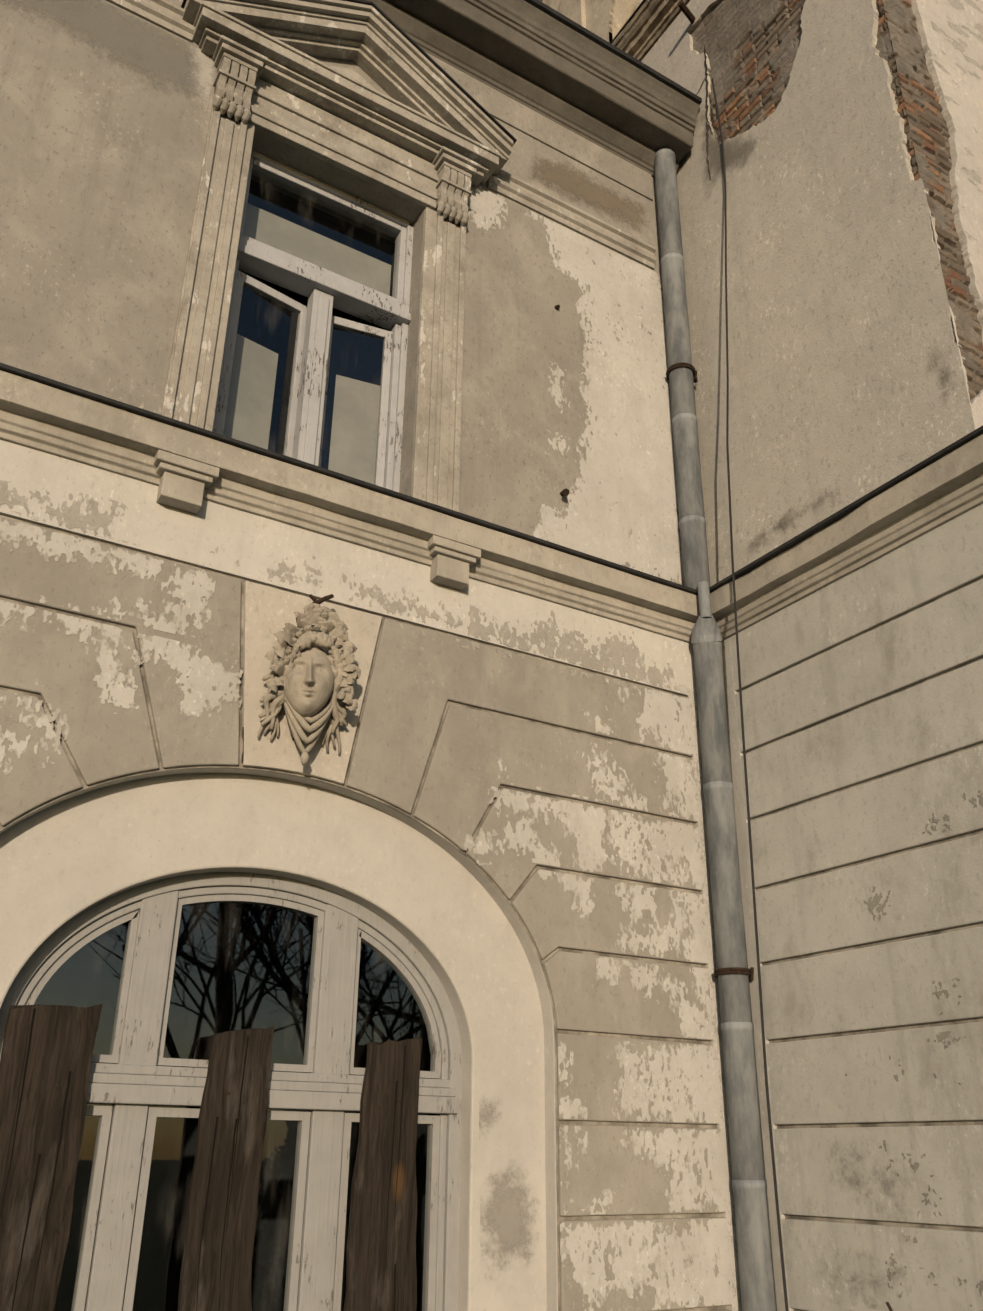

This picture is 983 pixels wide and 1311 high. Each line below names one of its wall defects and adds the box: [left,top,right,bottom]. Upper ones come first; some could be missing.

flaking render [691,0,806,142]
peeling [467,186,508,231]
peeling [524,210,684,585]
peeling [0,480,243,717]
peeling [267,556,323,588]
peeling [0,678,70,775]
peeling [342,572,741,1311]